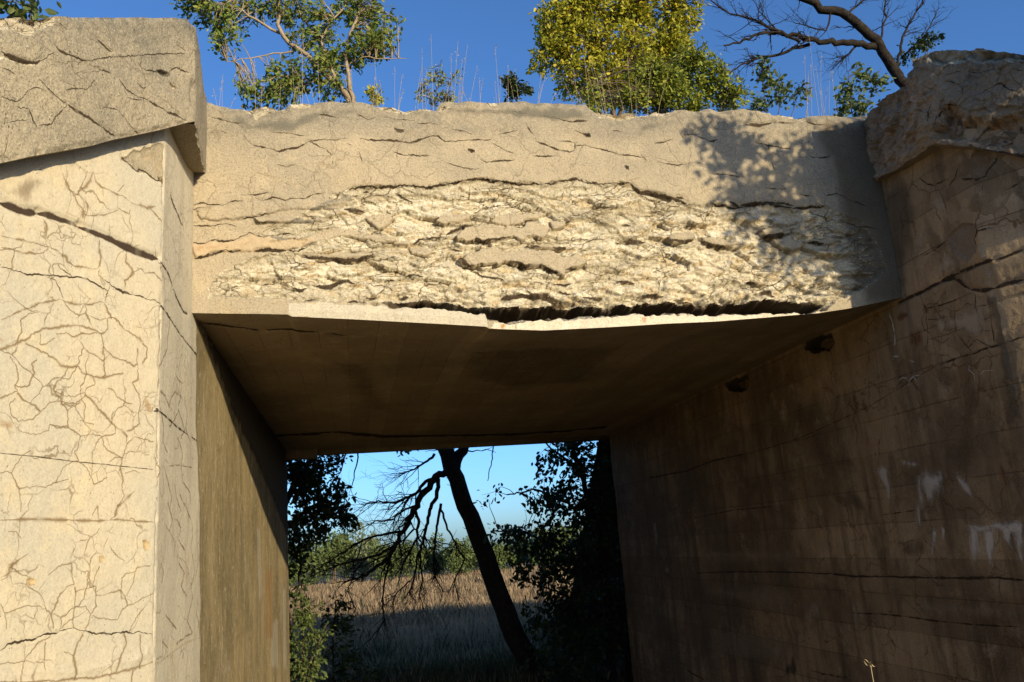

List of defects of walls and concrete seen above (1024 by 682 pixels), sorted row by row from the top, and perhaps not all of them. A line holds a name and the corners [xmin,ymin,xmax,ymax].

crack [916,68,1023,125]
crack [711,121,876,254]
crack [920,147,1024,190]
spalling [193,177,888,330]
crack [0,23,726,682]
crack [650,224,1024,478]
leakage [918,475,941,523]
leakage [970,523,1022,560]
crack [698,571,1023,581]
crack [853,612,1016,627]